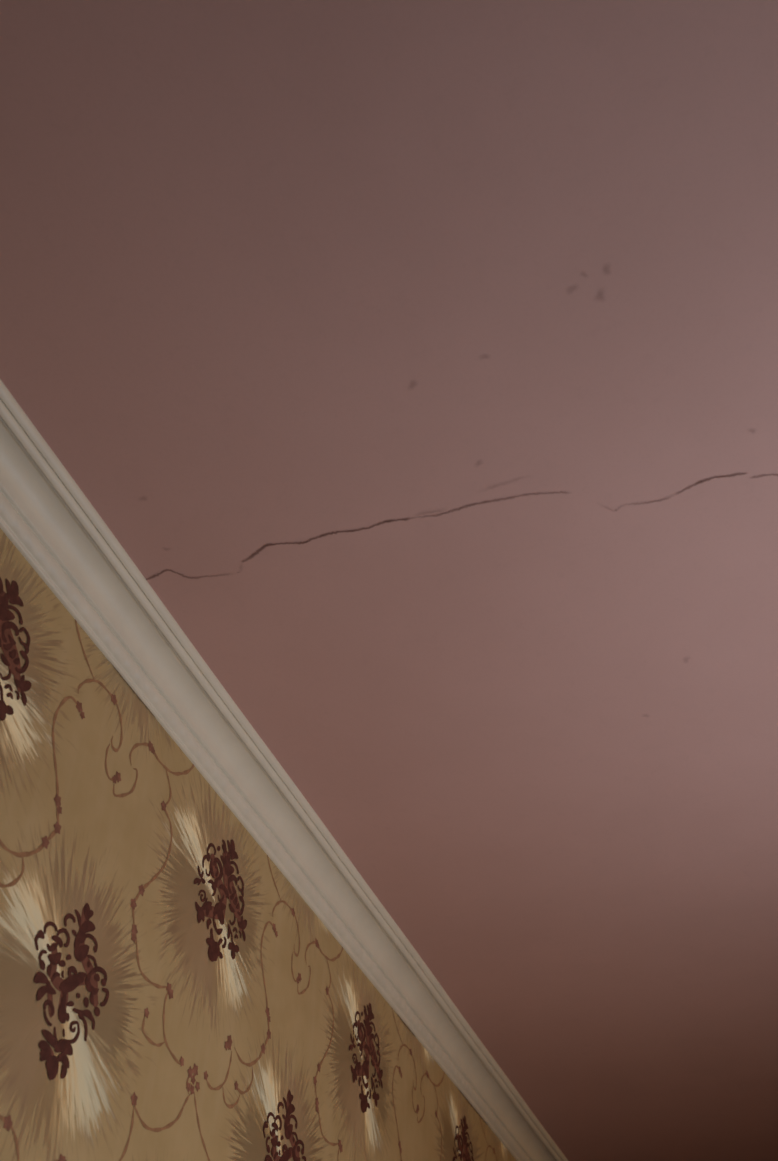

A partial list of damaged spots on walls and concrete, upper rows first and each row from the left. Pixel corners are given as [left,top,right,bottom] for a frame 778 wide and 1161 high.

crack [254,519,407,555]